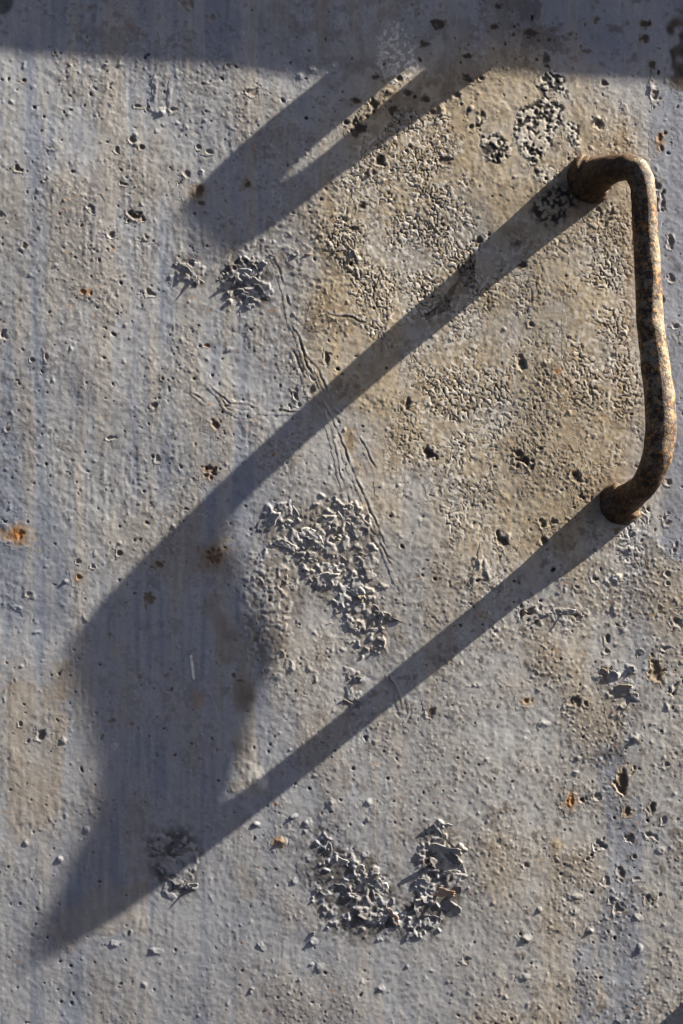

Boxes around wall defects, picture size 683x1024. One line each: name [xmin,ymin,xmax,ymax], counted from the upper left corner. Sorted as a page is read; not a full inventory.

rust [537,17,674,386]
rust [0,509,43,556]
crack [190,108,533,593]
rust [551,317,637,526]
crack [562,209,639,464]